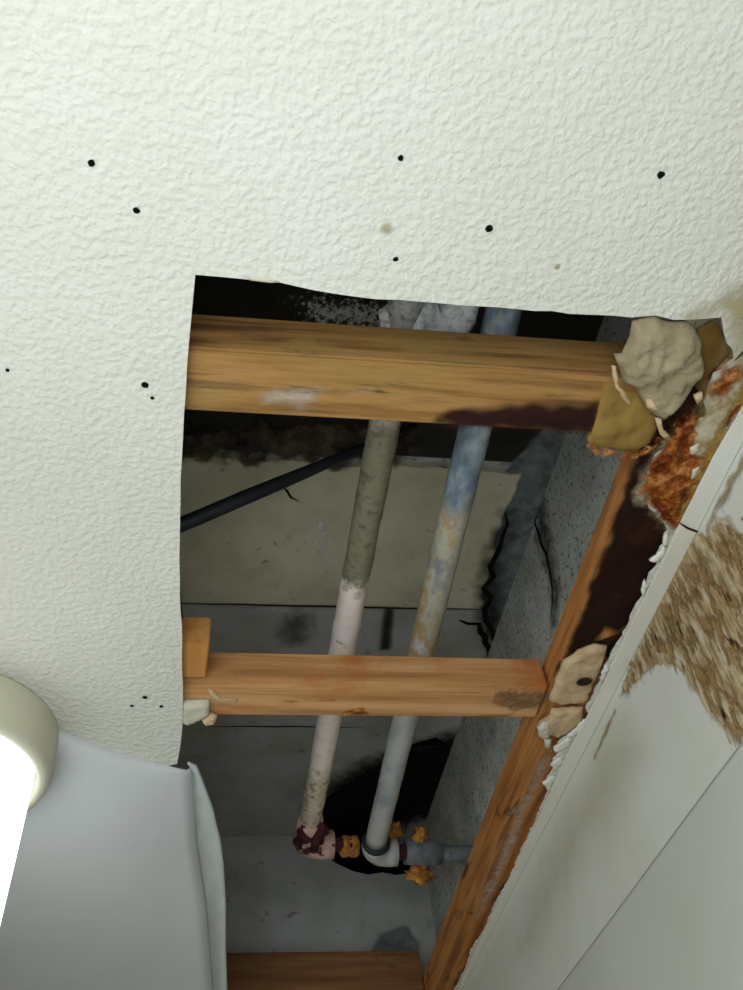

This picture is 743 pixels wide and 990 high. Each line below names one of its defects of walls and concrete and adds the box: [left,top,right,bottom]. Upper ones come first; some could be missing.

peeling [611,365,631,405]
rust [706,366,743,402]
water stain [437,404,668,459]
water stain [637,357,743,529]
rust [637,415,705,529]
crack [459,513,509,658]
crack [534,512,553,620]
peeling [649,530,669,563]
peeling [202,712,217,726]
peeling [537,718,585,792]
spalling [328,821,411,875]